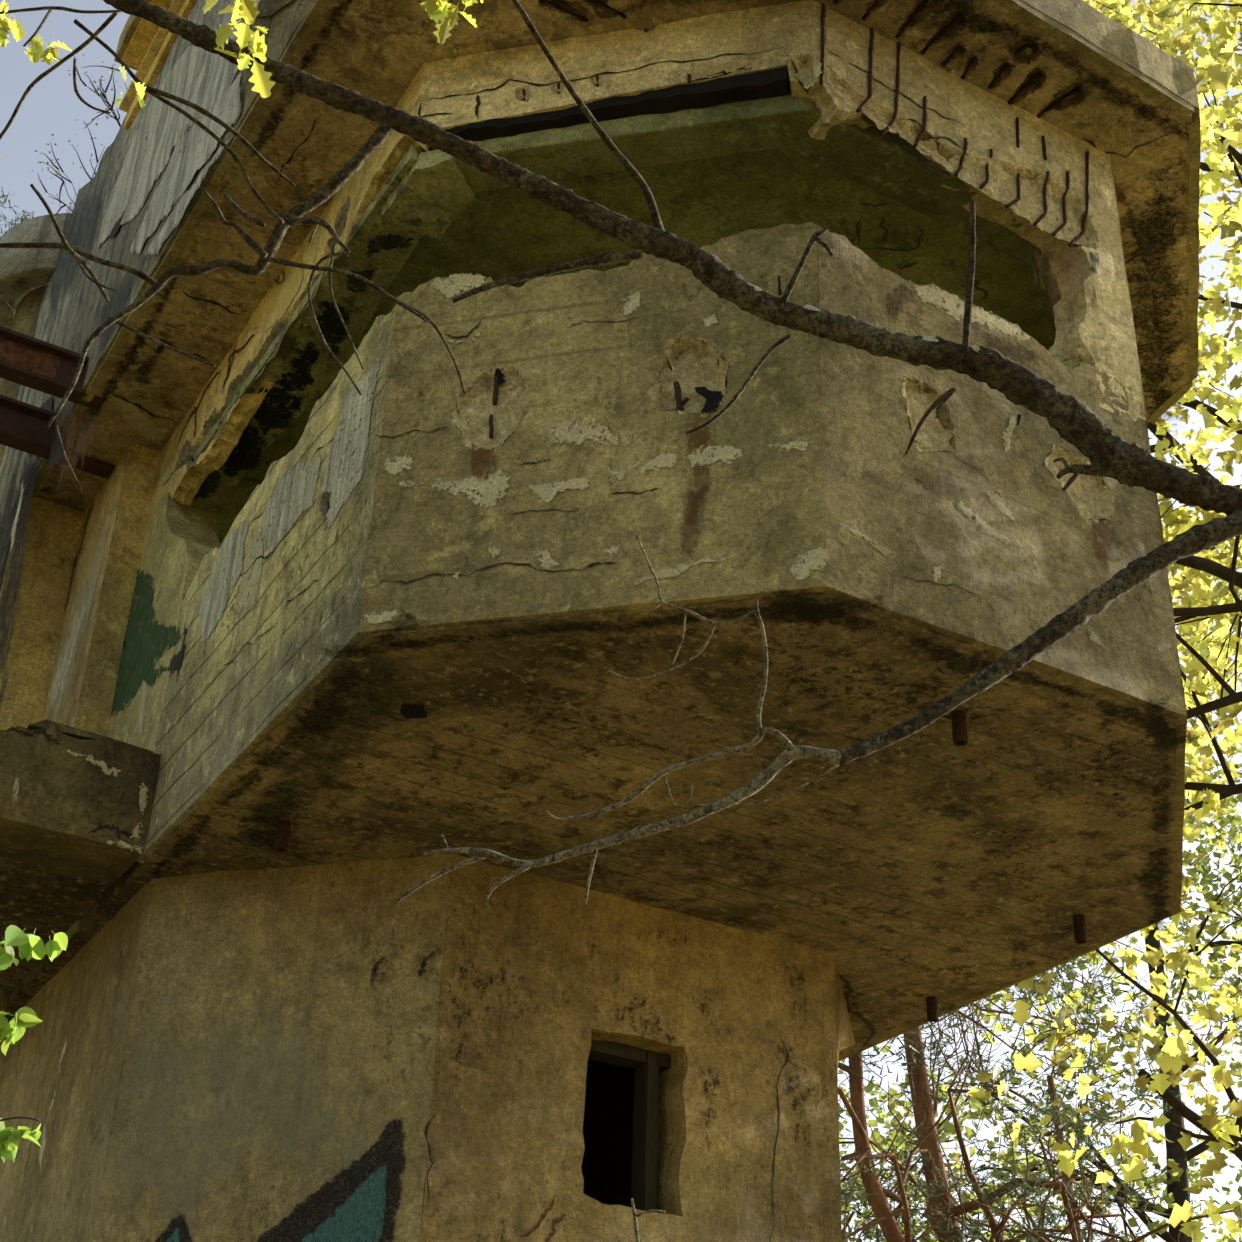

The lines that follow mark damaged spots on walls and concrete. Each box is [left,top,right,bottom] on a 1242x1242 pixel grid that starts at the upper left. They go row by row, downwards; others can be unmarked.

spalling [791,0,1101,342]
peeling [111,568,185,716]
peeling [195,358,380,645]
spalling [383,366,528,510]
crack [361,562,614,590]
leakage [150,589,992,878]
spalling [647,315,729,415]
corrosion [681,413,711,553]
spalling [1045,444,1115,531]
leakage [1006,671,1206,933]
leakage [1116,159,1188,436]
crack [769,1021,789,1242]